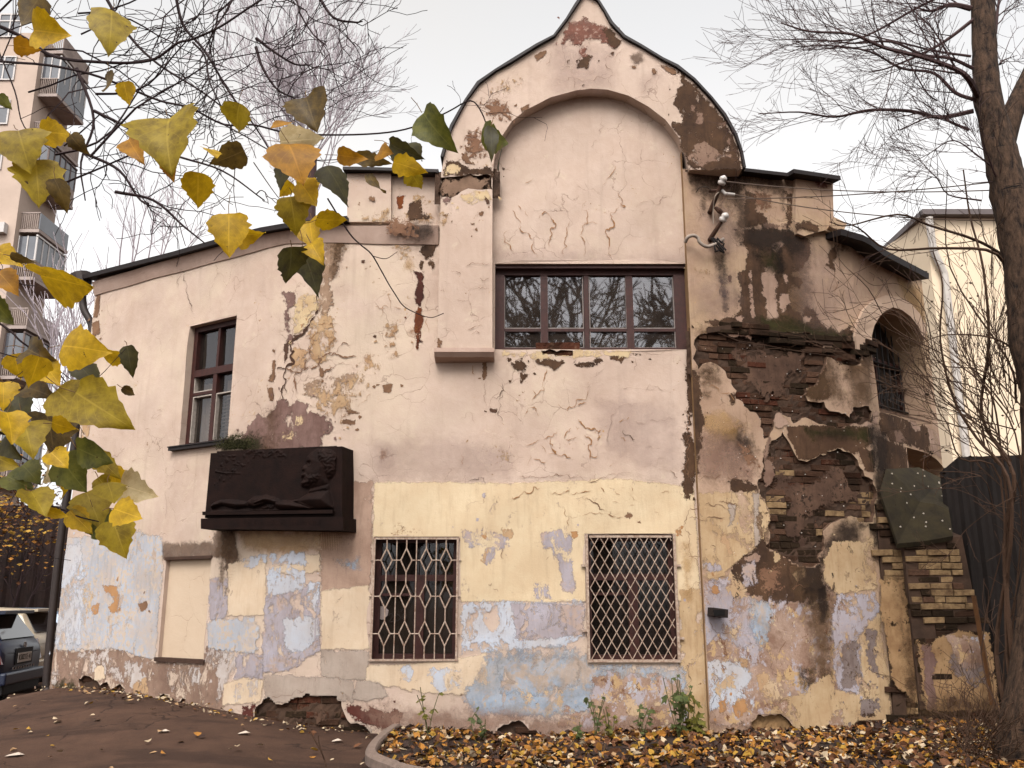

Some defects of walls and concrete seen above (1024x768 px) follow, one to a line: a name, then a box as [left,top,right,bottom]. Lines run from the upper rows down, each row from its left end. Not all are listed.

peeling [534,16,622,69]
spalling [652,65,742,172]
crack [503,169,663,256]
water stain [690,174,845,336]
crack [277,295,357,399]
spalling [237,243,403,450]
crack [471,360,757,592]
spalling [681,188,942,733]
peeling [452,518,514,566]
peeling [534,524,579,603]
spalling [49,532,403,733]
peeling [944,633,990,688]